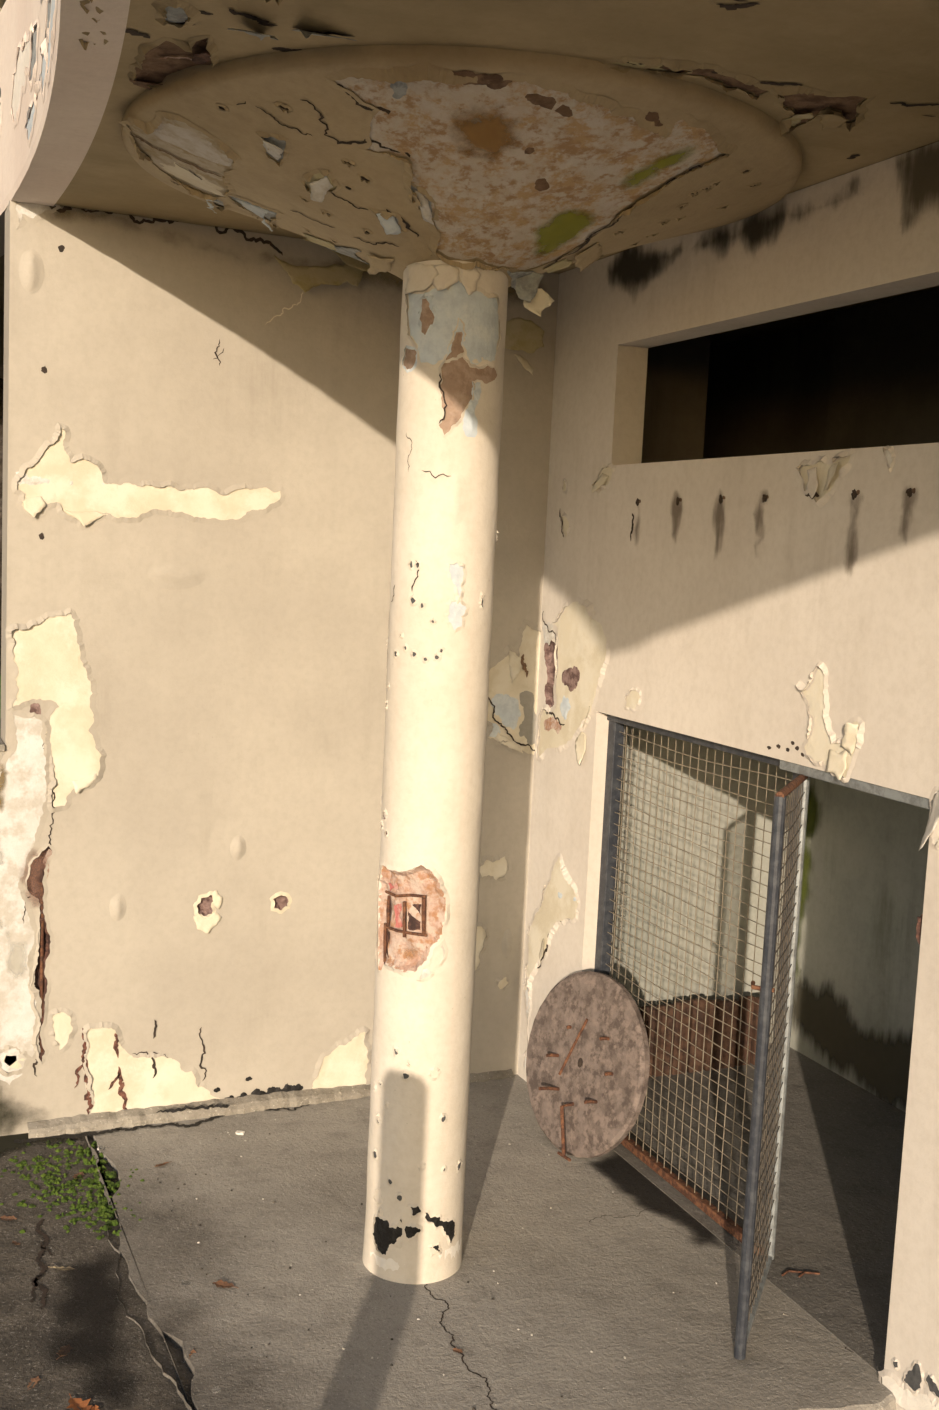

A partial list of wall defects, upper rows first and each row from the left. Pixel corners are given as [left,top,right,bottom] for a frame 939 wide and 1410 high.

crack [237,83,410,157]
crack [290,192,419,247]
peeling [265,63,738,438]
water stain [609,246,681,288]
water stain [702,206,801,250]
water stain [898,144,939,225]
peeling [11,422,286,530]
peeling [486,596,610,765]
peeling [0,608,226,1114]
water stain [792,981,912,1109]
spalling [370,1176,461,1271]
crack [424,1284,497,1410]